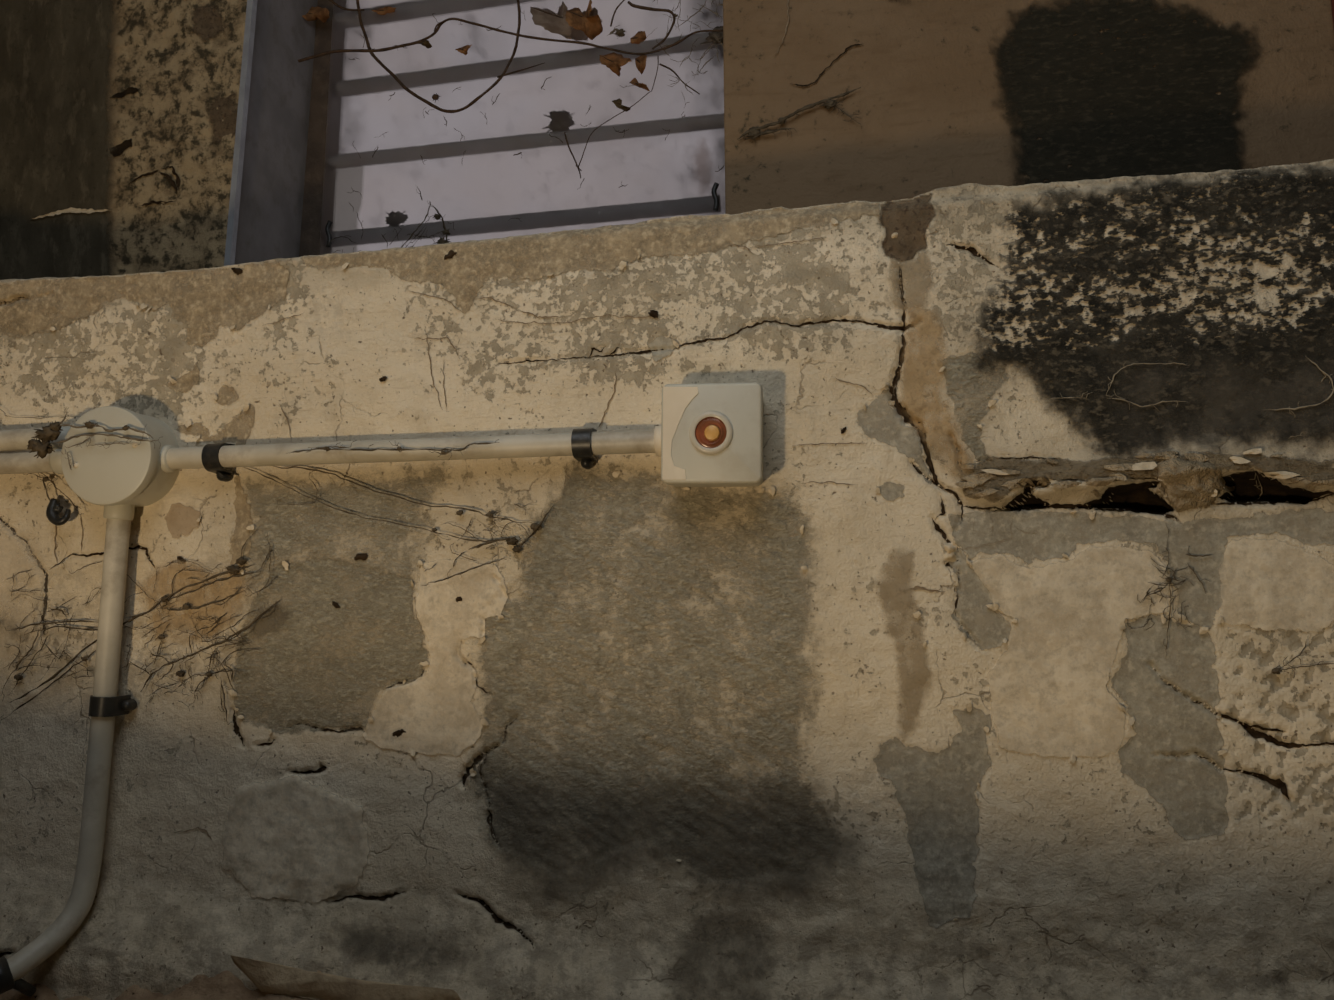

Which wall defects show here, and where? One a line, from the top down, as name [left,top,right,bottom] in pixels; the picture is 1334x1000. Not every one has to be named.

peeling [229,468,443,734]
peeling [469,466,836,880]
crack [409,268,1178,641]
peeling [873,552,991,928]
peeling [939,353,1334,840]
crack [1154,669,1334,799]
crack [1216,493,1334,505]